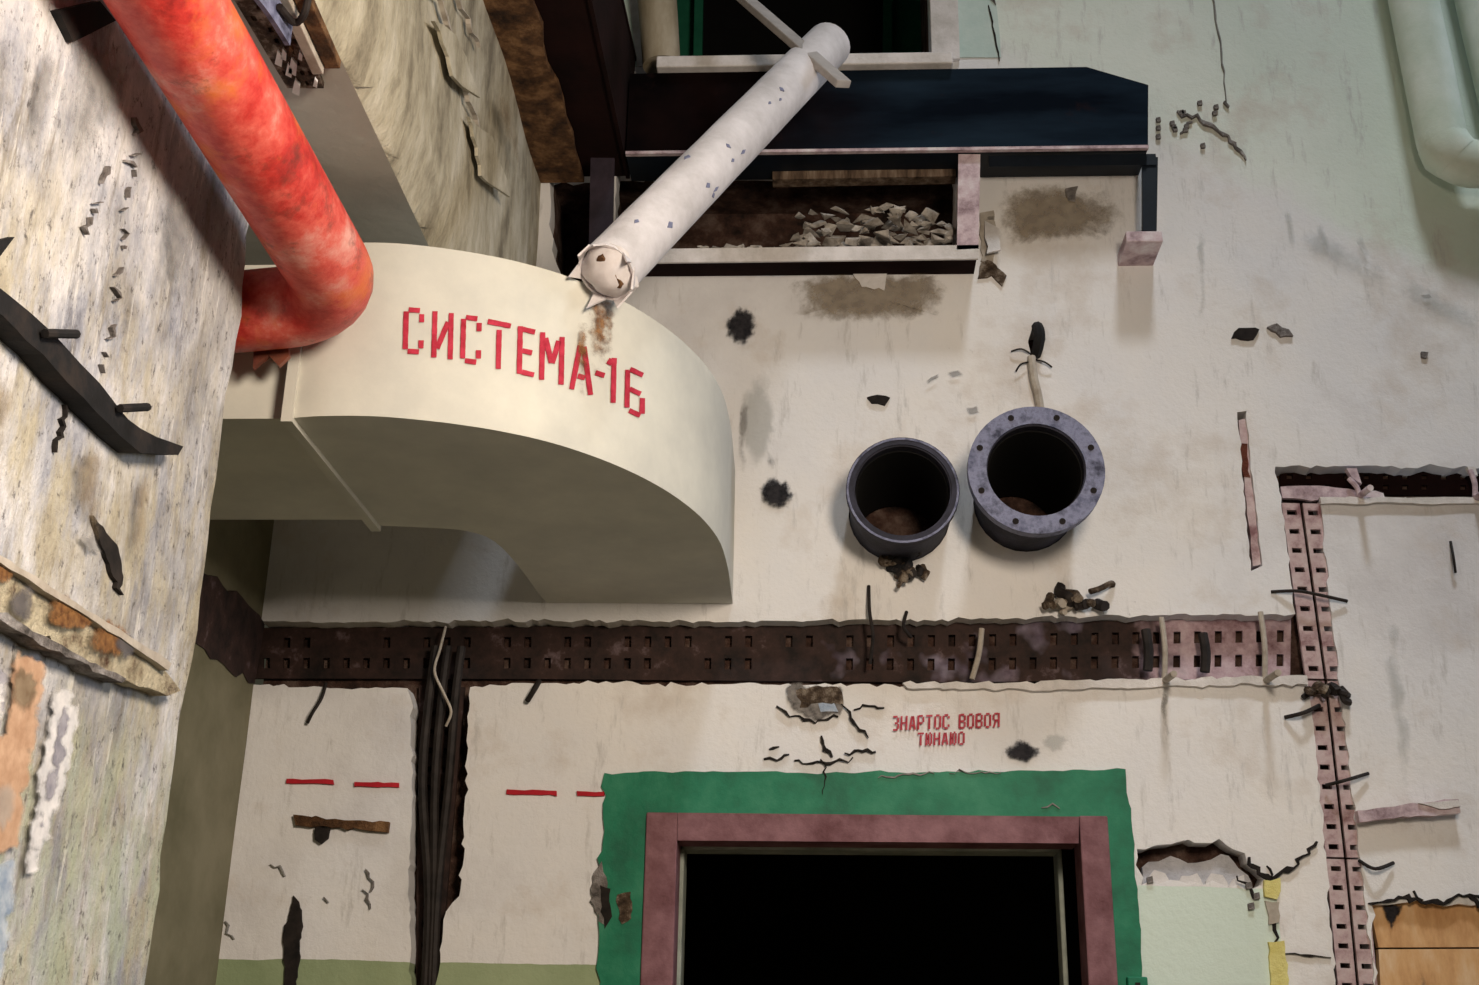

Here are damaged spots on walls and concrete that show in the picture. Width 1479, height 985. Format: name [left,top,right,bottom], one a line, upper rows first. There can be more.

crack [431,0,510,197]
crack [1155,0,1247,161]
crack [51,405,69,453]
spalling [81,515,124,595]
spalling [776,683,884,738]
peeling [0,654,79,977]
spalling [1141,854,1260,910]